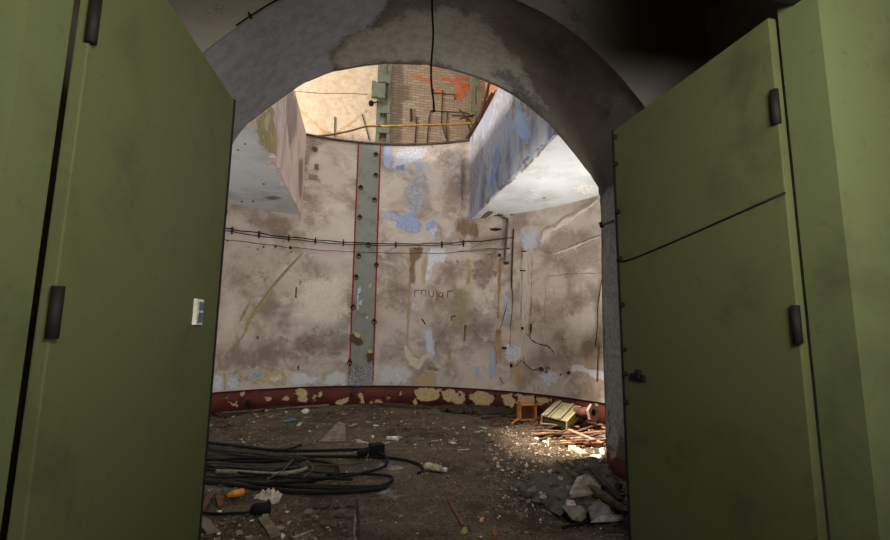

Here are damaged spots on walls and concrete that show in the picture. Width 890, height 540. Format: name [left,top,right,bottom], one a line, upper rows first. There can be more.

peeling [328,0,550,232]
peeling [382,209,443,243]
corrosion [406,246,427,345]
flaking render [248,368,323,420]
peeling [327,328,554,427]